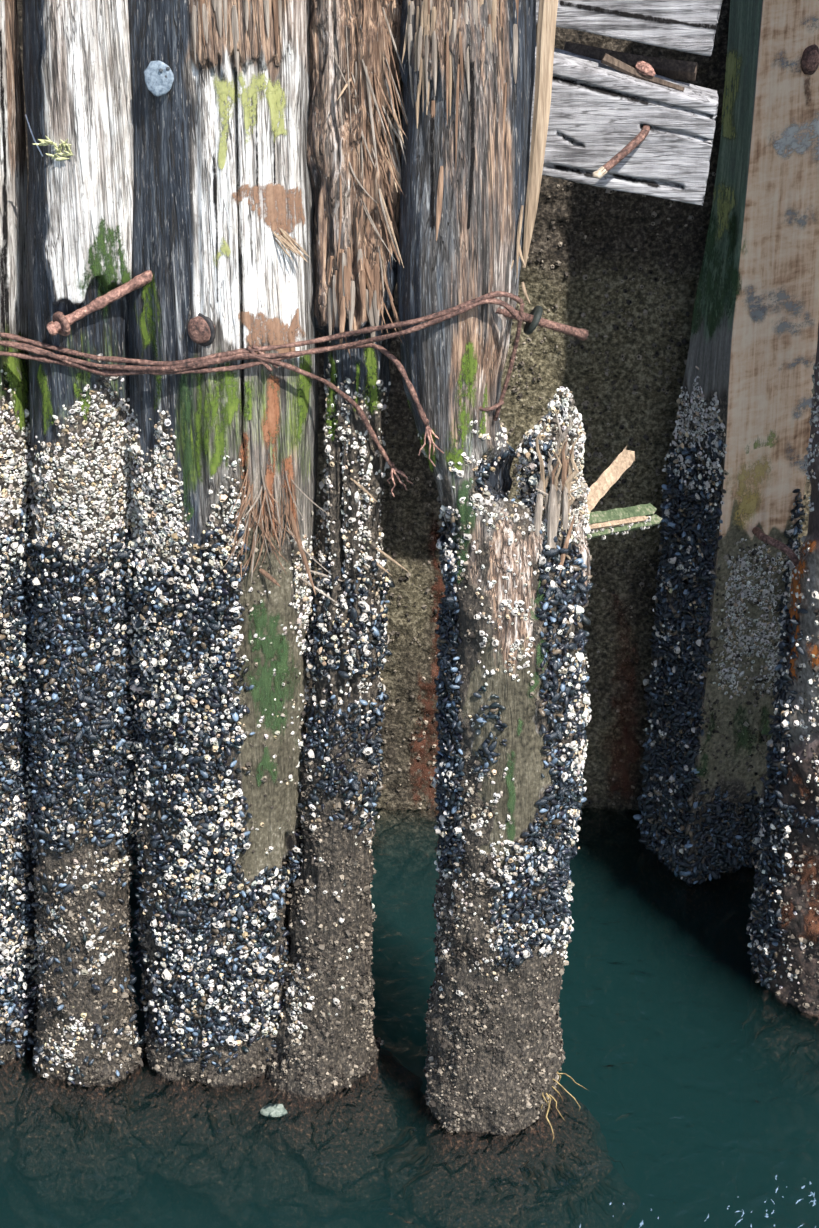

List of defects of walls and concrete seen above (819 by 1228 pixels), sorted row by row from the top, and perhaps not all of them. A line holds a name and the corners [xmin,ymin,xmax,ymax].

corrosion [789,541,819,680]
corrosion [780,850,819,944]